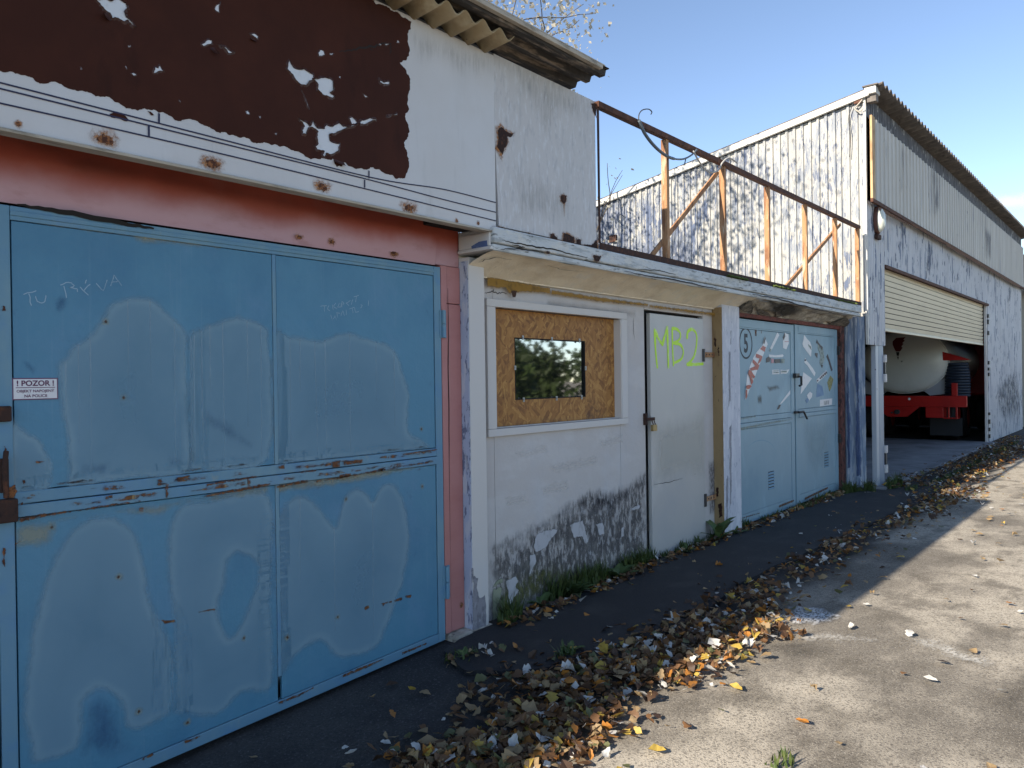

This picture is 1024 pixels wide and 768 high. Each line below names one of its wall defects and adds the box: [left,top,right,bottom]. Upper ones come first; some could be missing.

peeling [95,0,136,28]
peeling [200,38,235,55]
peeling [285,59,398,166]
corrosion [94,131,117,146]
corrosion [200,155,221,171]
corrosion [6,447,437,529]
spalling [570,520,604,543]
spalling [529,529,557,574]
water stain [495,481,645,612]